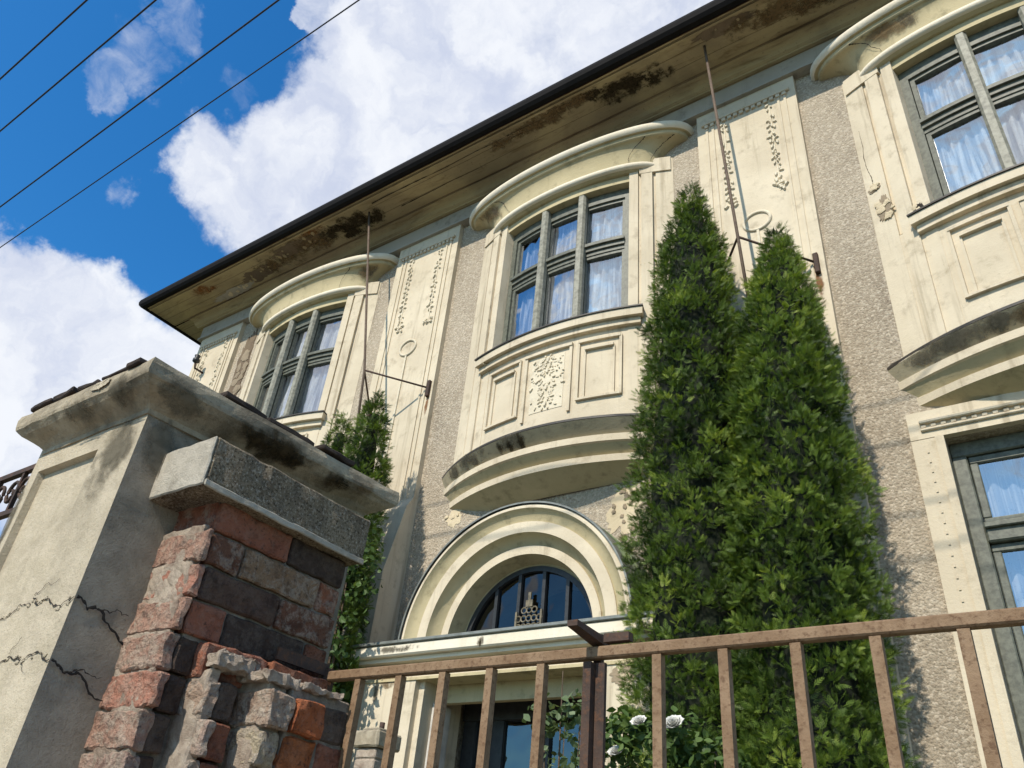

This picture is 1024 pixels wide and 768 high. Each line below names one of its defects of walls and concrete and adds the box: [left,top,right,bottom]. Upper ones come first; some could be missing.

leakage [493,63,674,152]
spalling [868,182,895,222]
leakage [265,209,385,271]
leakage [64,402,90,419]
leakage [98,420,132,481]
leakage [108,373,131,405]
leakage [144,381,201,475]
leakage [242,423,311,469]
leakage [325,473,371,493]
crack [0,579,128,702]